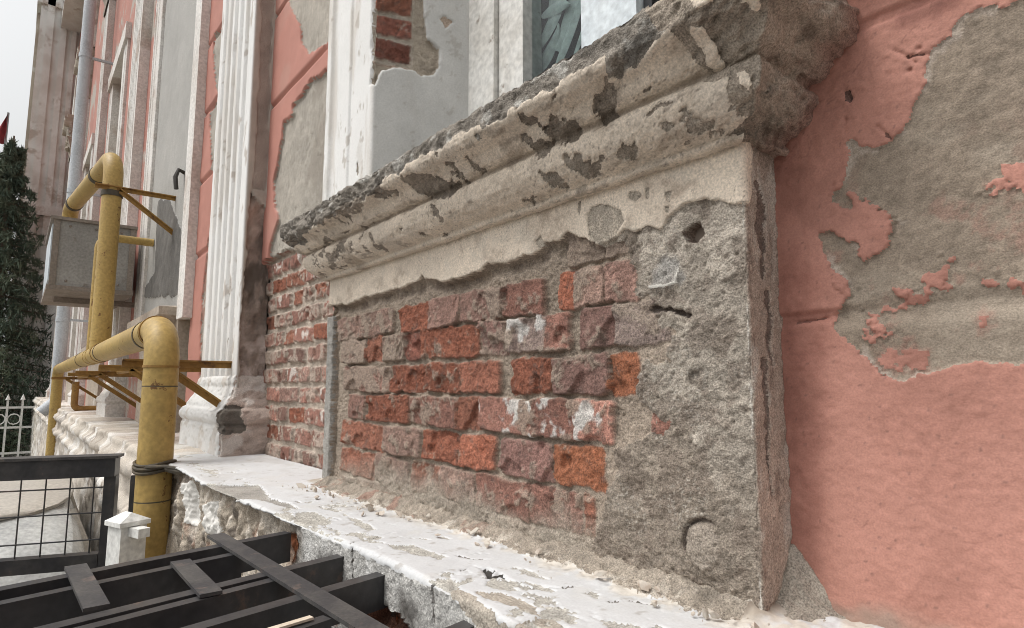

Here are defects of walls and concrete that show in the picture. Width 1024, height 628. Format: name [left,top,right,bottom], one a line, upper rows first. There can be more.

flaking render [216,0,679,551]
crack [649,306,692,318]
flaking render [818,0,1024,382]
peeling [177,455,579,628]
peeling [600,620,662,628]